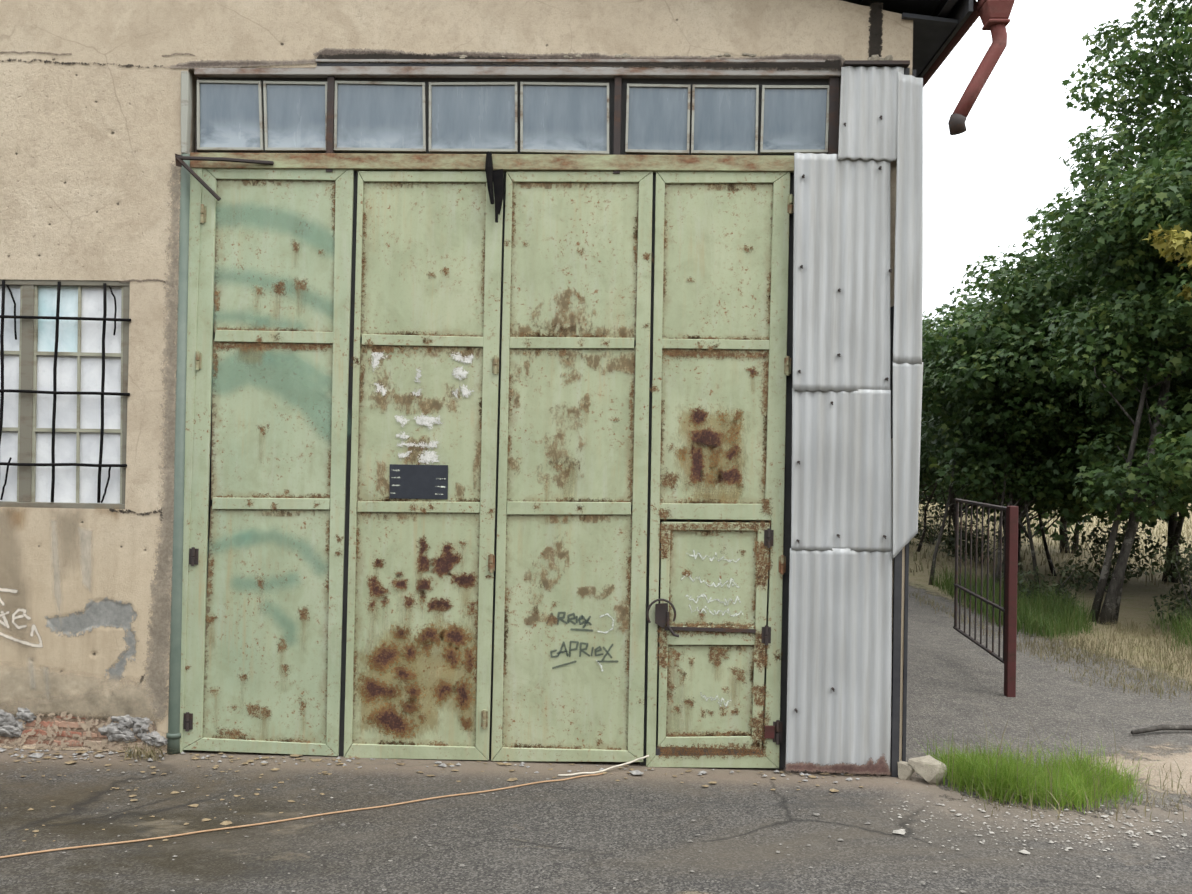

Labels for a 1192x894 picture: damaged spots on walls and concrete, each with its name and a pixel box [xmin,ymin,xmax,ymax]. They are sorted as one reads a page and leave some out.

crack [0,51,194,68]
corrosion [504,182,590,247]
corrosion [633,217,667,295]
corrosion [351,331,480,415]
corrosion [508,286,648,444]
spalling [0,161,181,753]
corrosion [247,451,331,516]
corrosion [534,393,633,523]
corrosion [649,273,783,759]
corrosion [325,522,494,746]
corrosion [525,542,569,626]
corrosion [578,556,631,672]